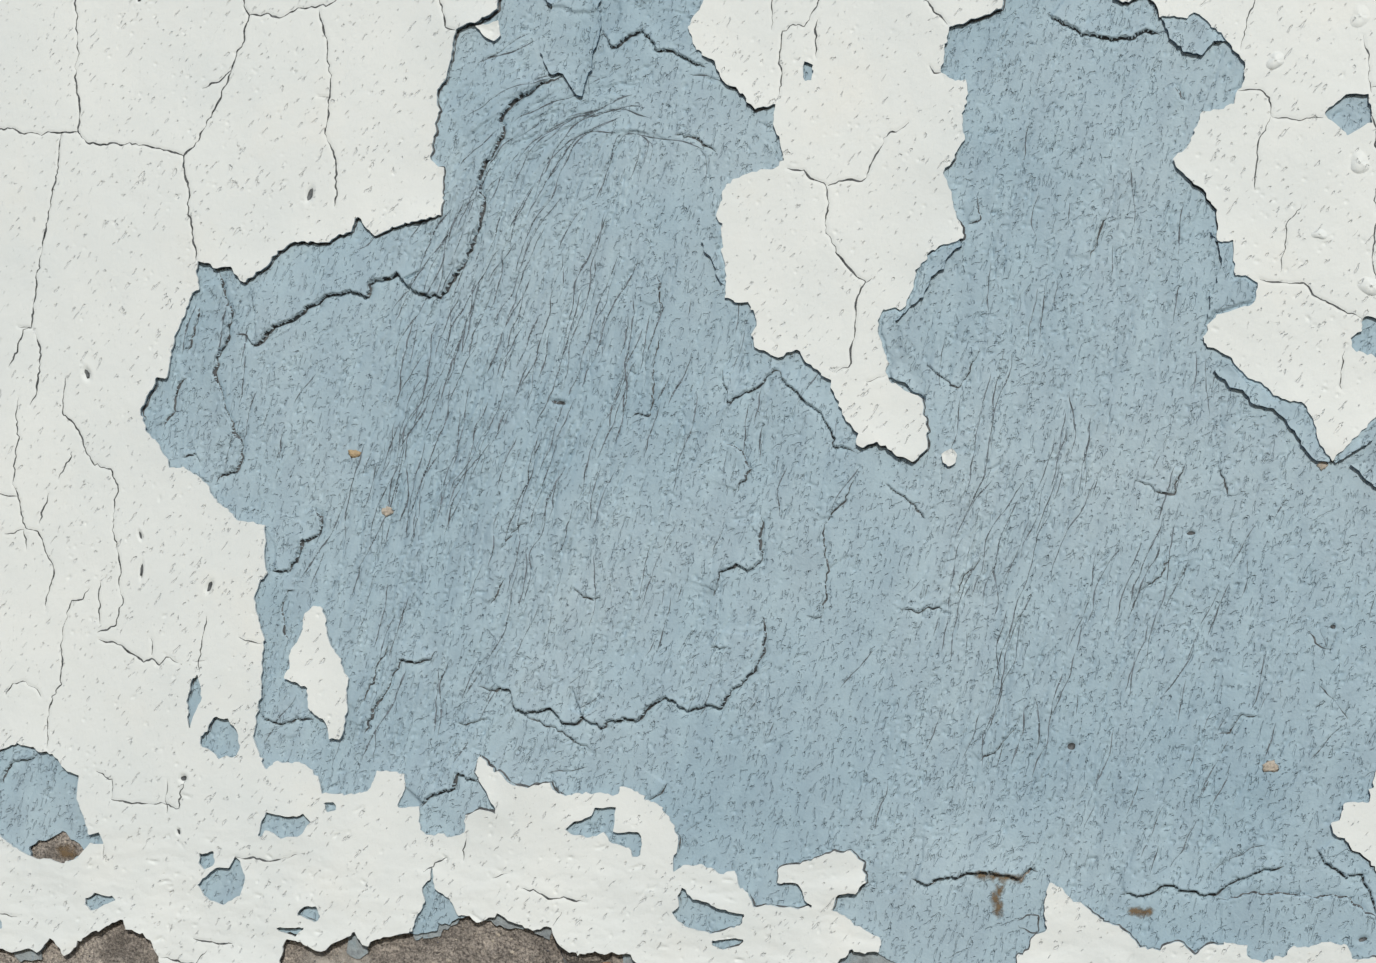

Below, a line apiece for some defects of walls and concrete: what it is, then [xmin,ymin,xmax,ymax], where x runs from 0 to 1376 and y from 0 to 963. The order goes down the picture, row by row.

crack [1239,89,1323,187]
peeling [1325,94,1372,135]
crack [1364,43,1376,148]
peeling [260,218,361,273]
crack [1260,205,1359,317]
crack [1368,189,1376,275]
crack [0,0,338,743]
peeling [187,675,240,759]
peeling [0,743,103,861]
crack [97,771,184,811]
peeling [566,807,642,857]
peeling [673,888,744,949]